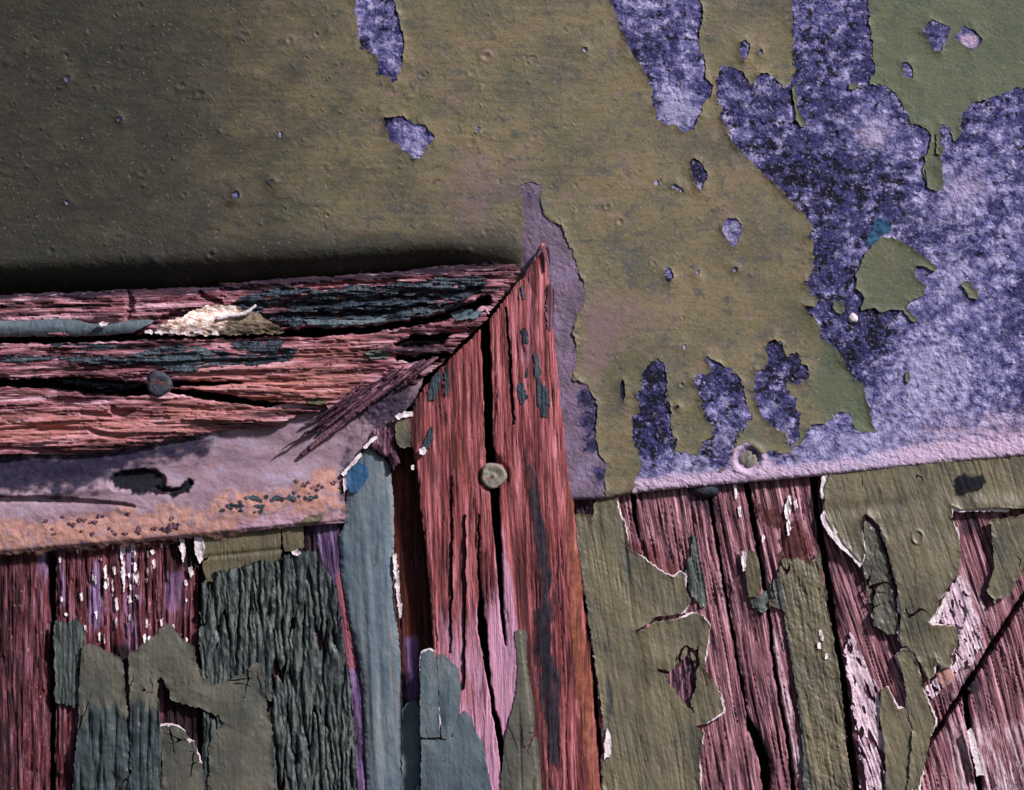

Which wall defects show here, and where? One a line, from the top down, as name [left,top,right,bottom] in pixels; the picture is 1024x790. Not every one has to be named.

peeling [354,0,405,83]
peeling [384,115,435,159]
peeling [0,270,488,373]
peeling [306,397,327,406]
peeling [428,369,449,400]
peeling [610,0,1024,790]
rust [0,467,345,554]
crack [0,295,515,771]
peeling [517,182,726,790]
peeling [53,513,359,790]